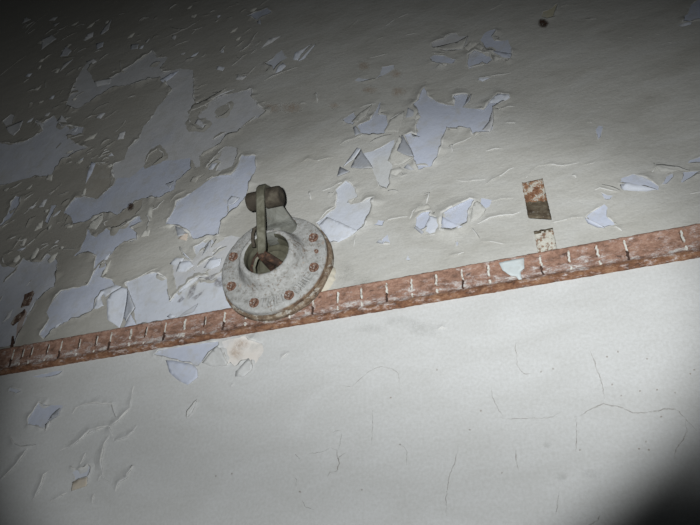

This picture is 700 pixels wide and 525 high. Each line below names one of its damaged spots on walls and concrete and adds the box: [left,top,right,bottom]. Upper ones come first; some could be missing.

peeling [427,26,519,82]
peeling [0,12,315,349]
peeling [308,81,520,256]
peeling [594,154,700,194]
peeling [559,202,624,232]
rust [0,224,700,376]
peeling [30,368,65,380]
peeling [149,332,267,388]